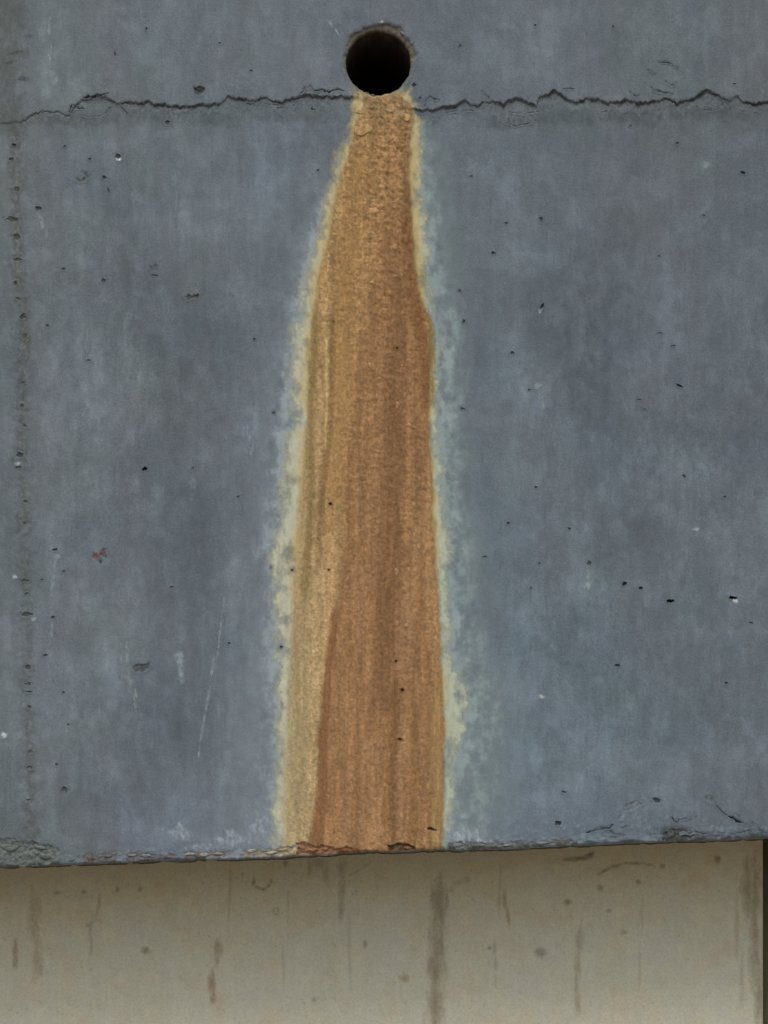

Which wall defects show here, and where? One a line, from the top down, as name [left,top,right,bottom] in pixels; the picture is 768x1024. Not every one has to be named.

crack [19,84,354,129]
crack [413,60,768,128]
corrosion [270,90,469,857]
spalling [0,834,362,867]
spalling [386,842,419,853]
spalling [445,819,579,851]
spalling [658,825,698,843]